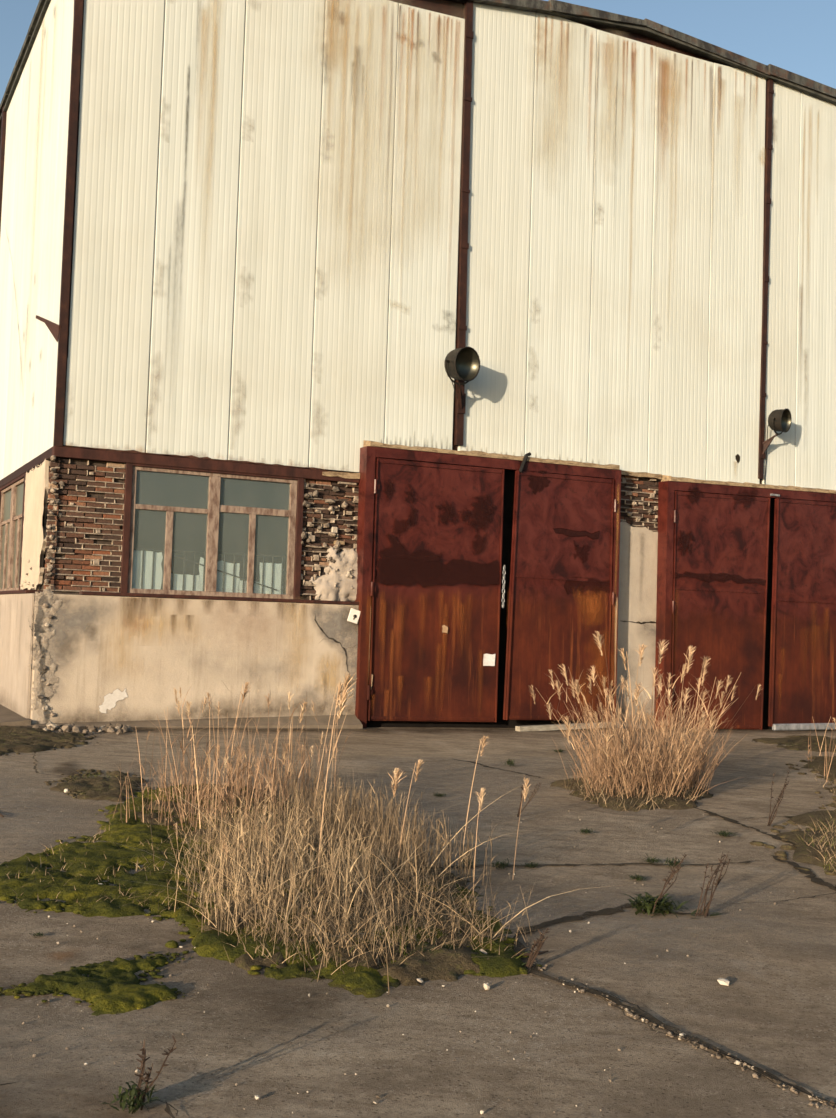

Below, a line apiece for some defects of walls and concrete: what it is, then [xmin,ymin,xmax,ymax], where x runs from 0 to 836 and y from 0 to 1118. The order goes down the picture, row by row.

rust [528,471,550,494]
spalling [300,479,359,600]
rust [376,496,500,588]
rust [553,528,600,539]
spalling [20,455,126,724]
rust [675,572,766,585]
damp [50,606,96,658]
crack [314,615,356,683]
rust [595,598,618,681]
crack [574,981,836,1108]
crack [158,1100,178,1118]